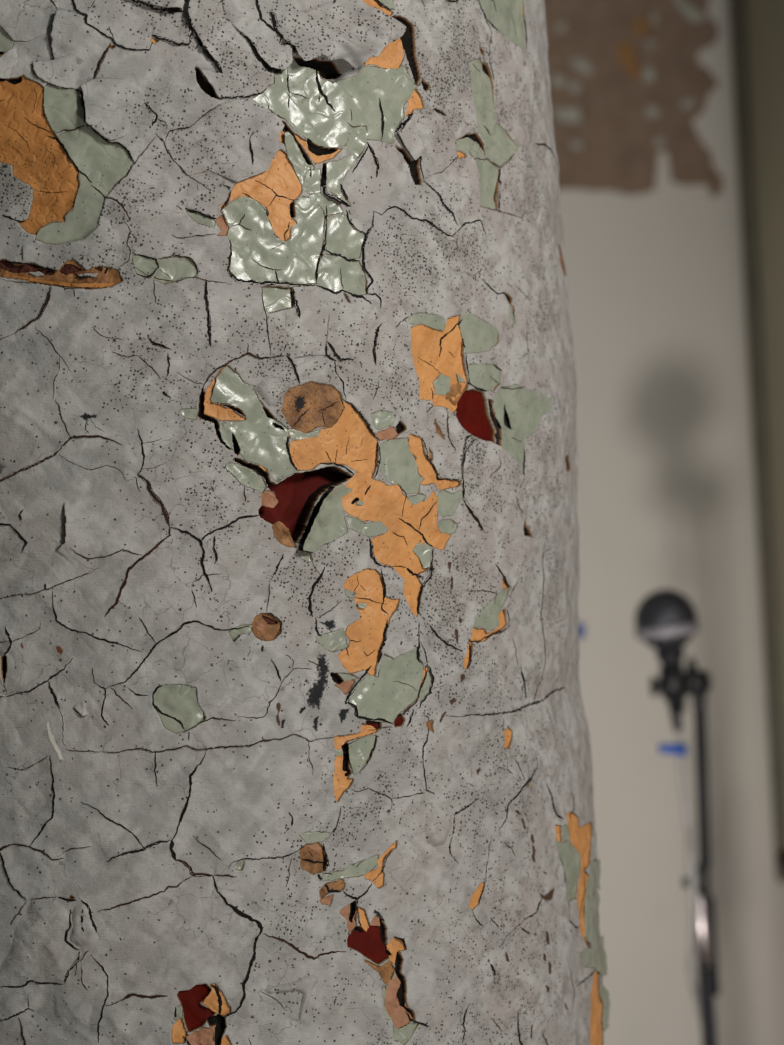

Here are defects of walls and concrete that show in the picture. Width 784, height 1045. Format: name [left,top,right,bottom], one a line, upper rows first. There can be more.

peeling [0,0,146,244]
crack [24,0,382,398]
peeling [132,0,527,355]
crack [373,159,487,248]
crack [0,286,346,1018]
peeling [179,312,552,801]
crack [333,497,565,835]
crack [427,406,484,532]
crack [91,955,167,1043]
peeling [172,984,231,1045]
peeling [299,832,429,1045]
peeling [547,785,610,1045]